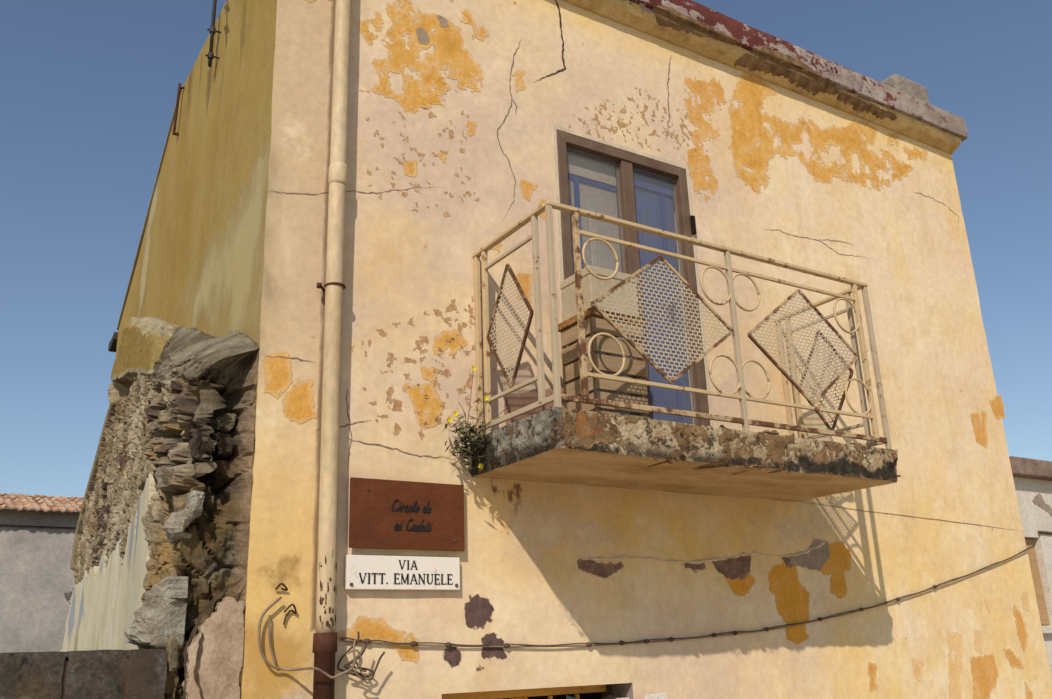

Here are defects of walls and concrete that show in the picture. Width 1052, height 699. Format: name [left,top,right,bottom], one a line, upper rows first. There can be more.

peeling [358,0,489,114]
crack [537,0,566,81]
crack [497,40,521,222]
peeling [622,0,928,201]
crack [275,187,436,195]
leakage [468,434,504,472]
mould [719,457,762,469]
mould [776,453,897,479]
leakage [64,588,83,648]
flaking render [464,594,507,671]
flaking render [683,555,755,596]
peeling [768,539,852,644]